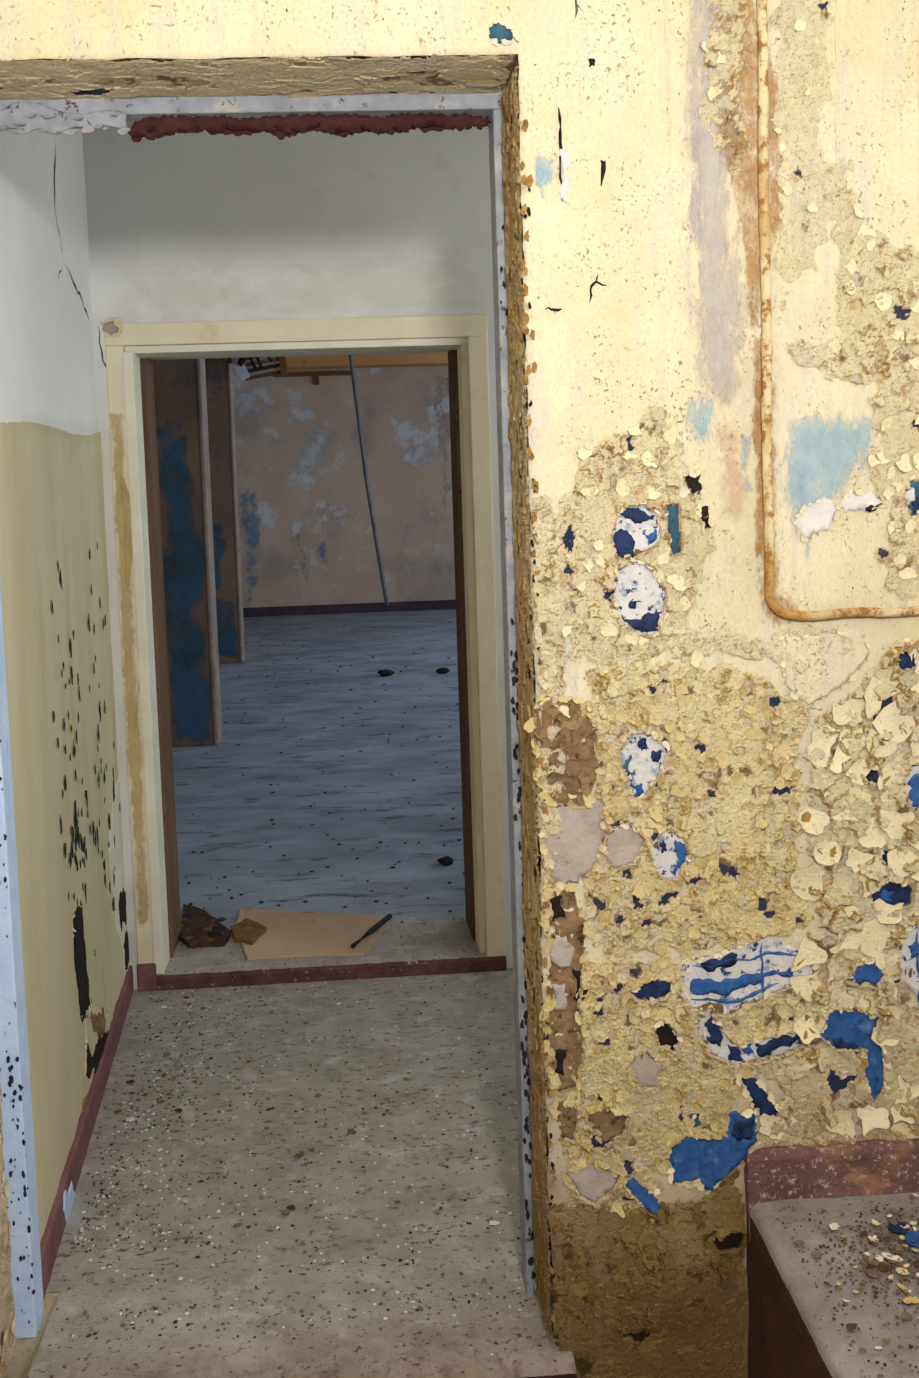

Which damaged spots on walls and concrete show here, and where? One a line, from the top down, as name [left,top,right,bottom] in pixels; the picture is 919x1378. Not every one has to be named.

peeling [53,584,129,1112]